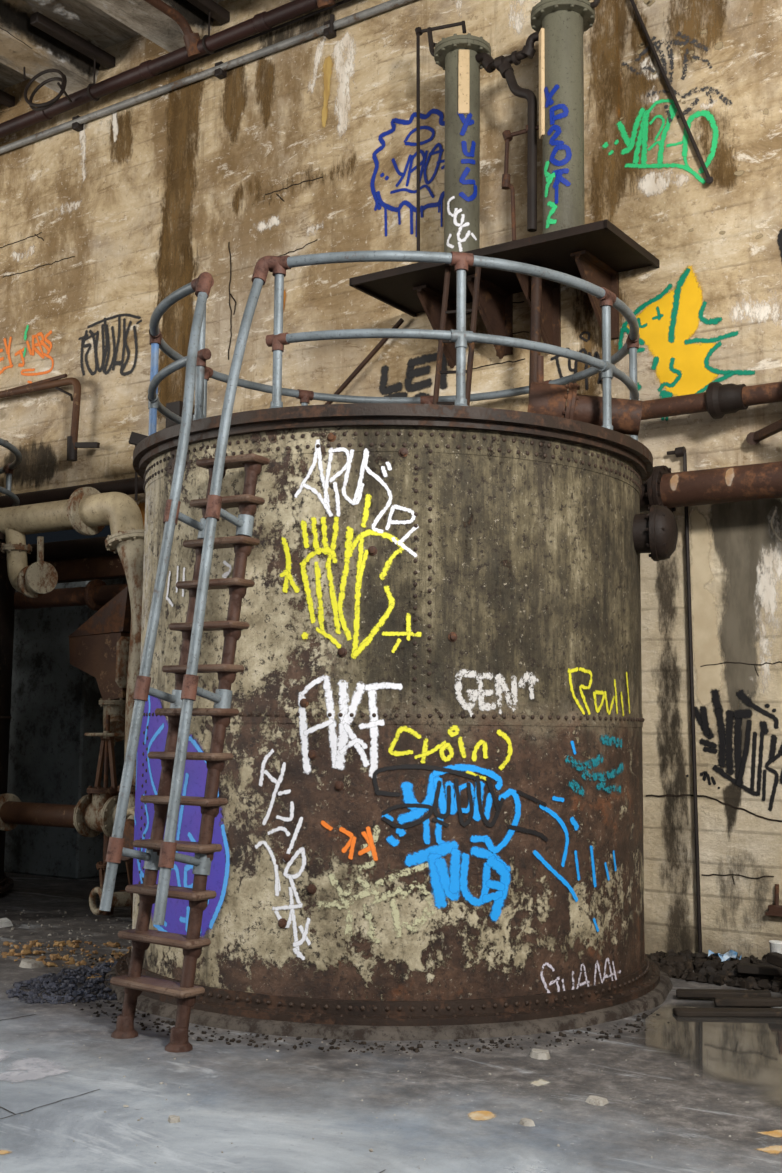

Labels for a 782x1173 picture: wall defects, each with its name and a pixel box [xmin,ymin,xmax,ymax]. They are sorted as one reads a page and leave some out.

water stain [221,8,355,143]
water stain [584,0,654,222]
water stain [667,0,727,67]
water stain [156,67,205,420]
water stain [710,498,782,756]
water stain [0,1049,68,1082]
crack [1,1089,100,1119]